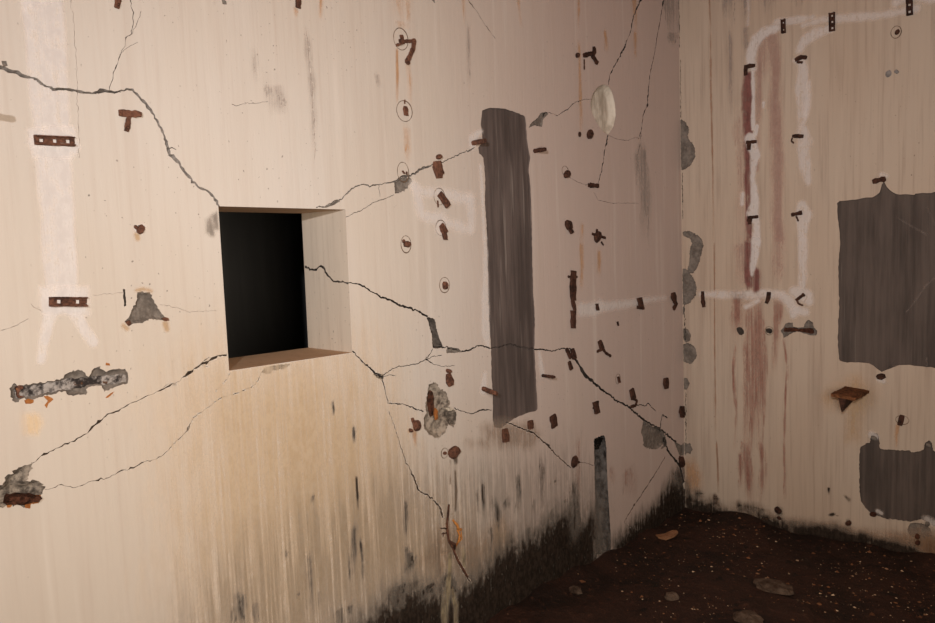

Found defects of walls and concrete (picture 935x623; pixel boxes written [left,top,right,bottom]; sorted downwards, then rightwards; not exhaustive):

damp [23,0,98,364]
crack [0,0,220,206]
crack [316,148,473,217]
damp [744,0,935,267]
flaking render [123,289,170,326]
flaking render [0,462,45,509]
flaking render [9,363,128,408]
crack [33,354,261,490]
flaking render [424,382,457,438]
damp [336,477,600,623]
crack [305,265,687,526]
damp [613,468,920,553]